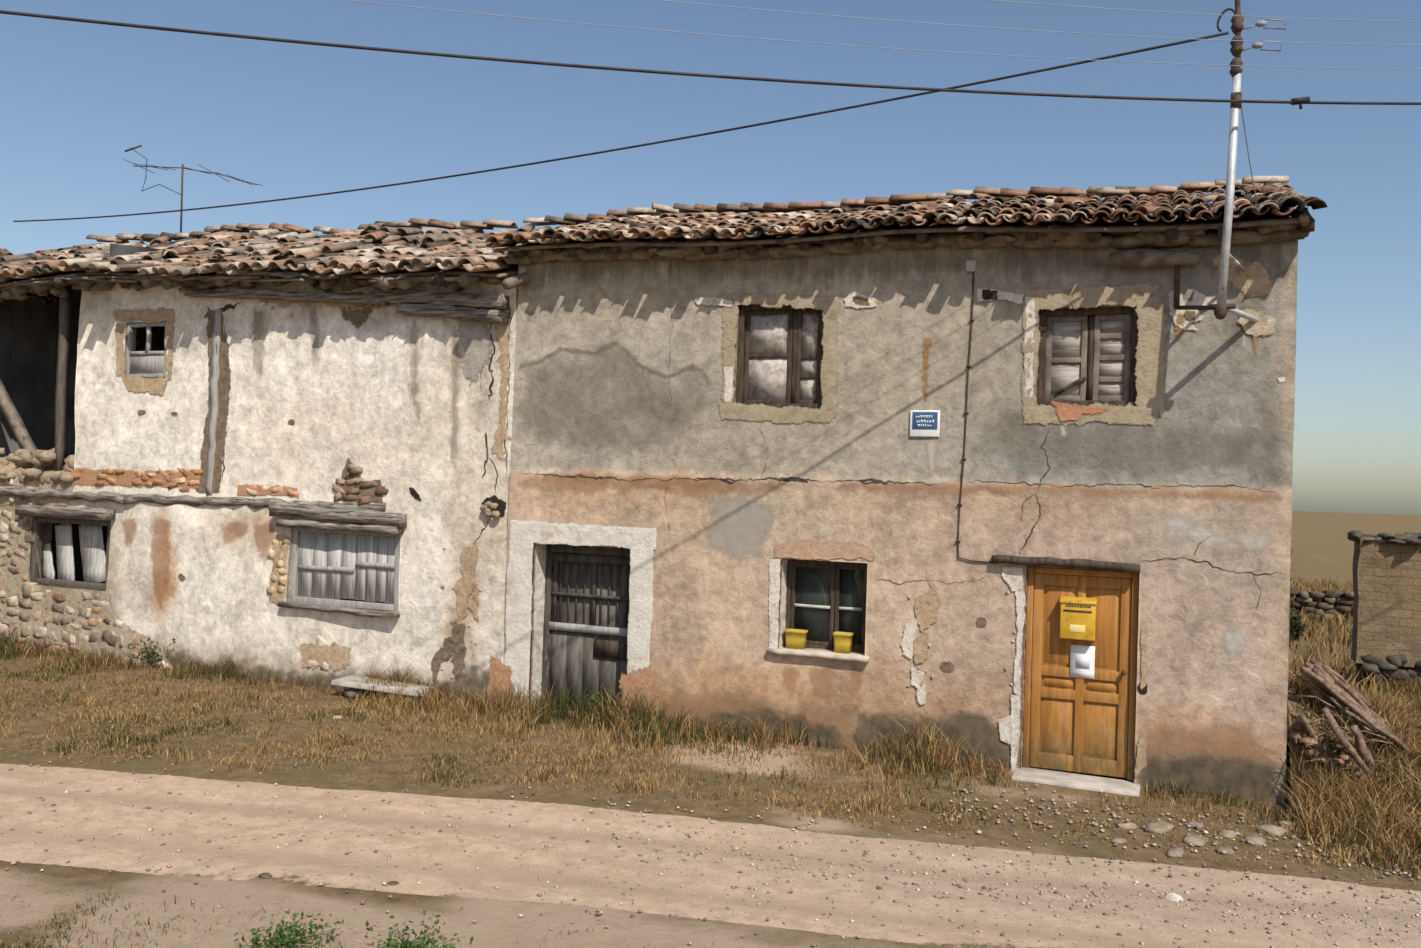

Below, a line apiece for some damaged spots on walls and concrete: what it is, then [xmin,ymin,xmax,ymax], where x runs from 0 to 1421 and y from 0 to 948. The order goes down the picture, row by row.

spalling [1168,290,1217,331]
spalling [1211,253,1276,346]
crack [474,308,1278,555]
spalling [1051,400,1109,436]
crack [1141,535,1284,607]
spalling [299,636,351,672]
peeling [431,544,516,702]
peeling [900,588,955,705]
peeling [998,567,1026,771]